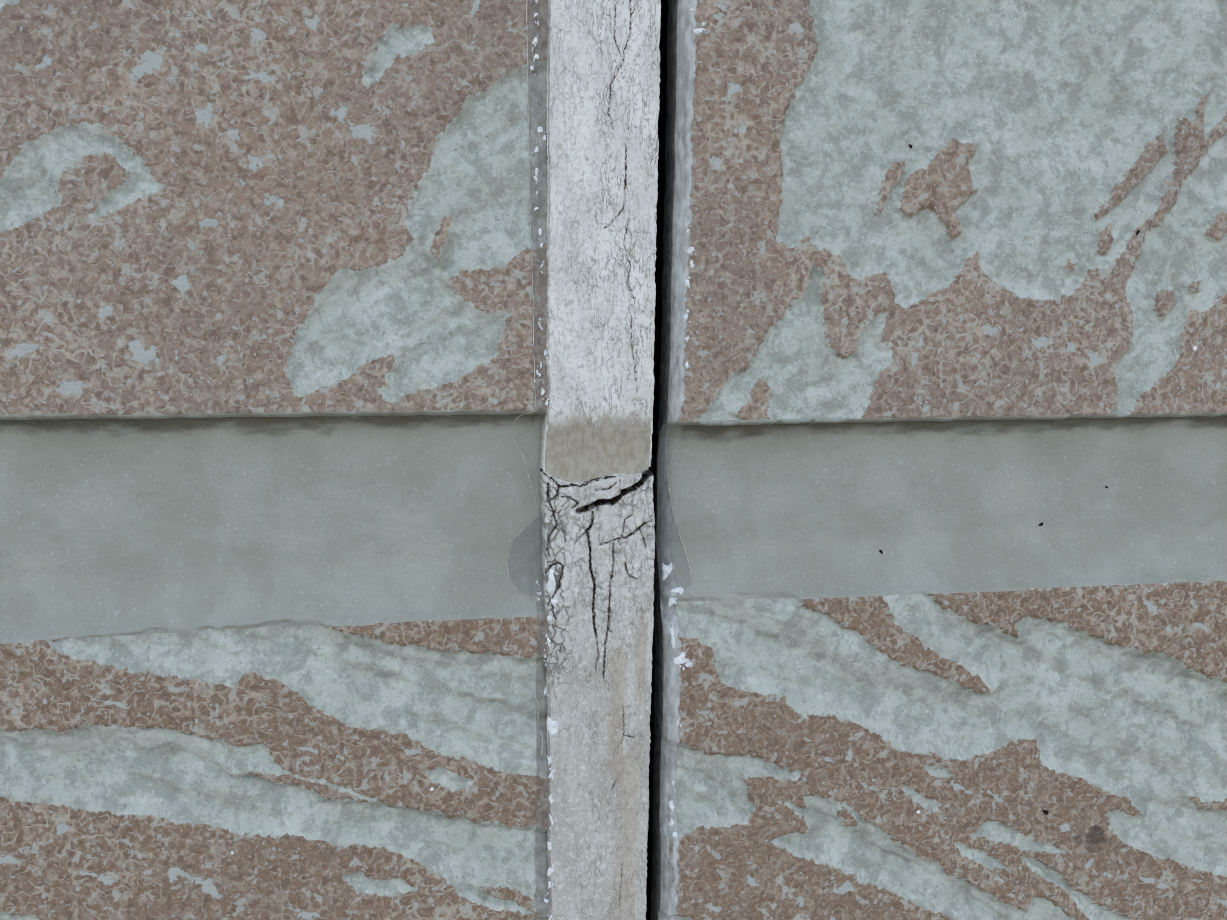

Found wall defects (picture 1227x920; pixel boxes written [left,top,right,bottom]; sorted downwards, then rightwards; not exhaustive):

spalling [0,0,23,11]
spalling [0,121,165,234]
spalling [285,0,548,403]
peeling [685,225,695,289]
spalling [687,0,1227,421]
crack [540,468,653,678]
spalling [0,568,559,920]
spalling [660,718,1134,920]
spalling [660,563,1227,878]